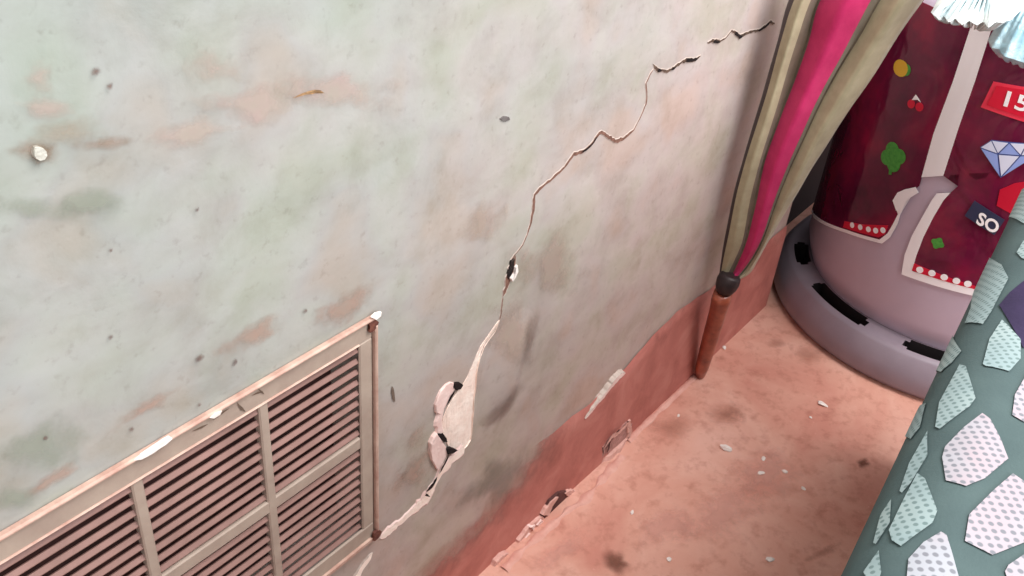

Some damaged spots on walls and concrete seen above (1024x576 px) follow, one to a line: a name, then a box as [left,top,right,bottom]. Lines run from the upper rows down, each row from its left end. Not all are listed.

crack [499,20,775,320]
spalling [428,320,500,472]
spalling [585,369,625,419]
spalling [135,436,172,460]
spalling [601,419,632,464]
crack [353,444,465,576]
spalling [515,488,575,543]
spalling [491,550,509,567]